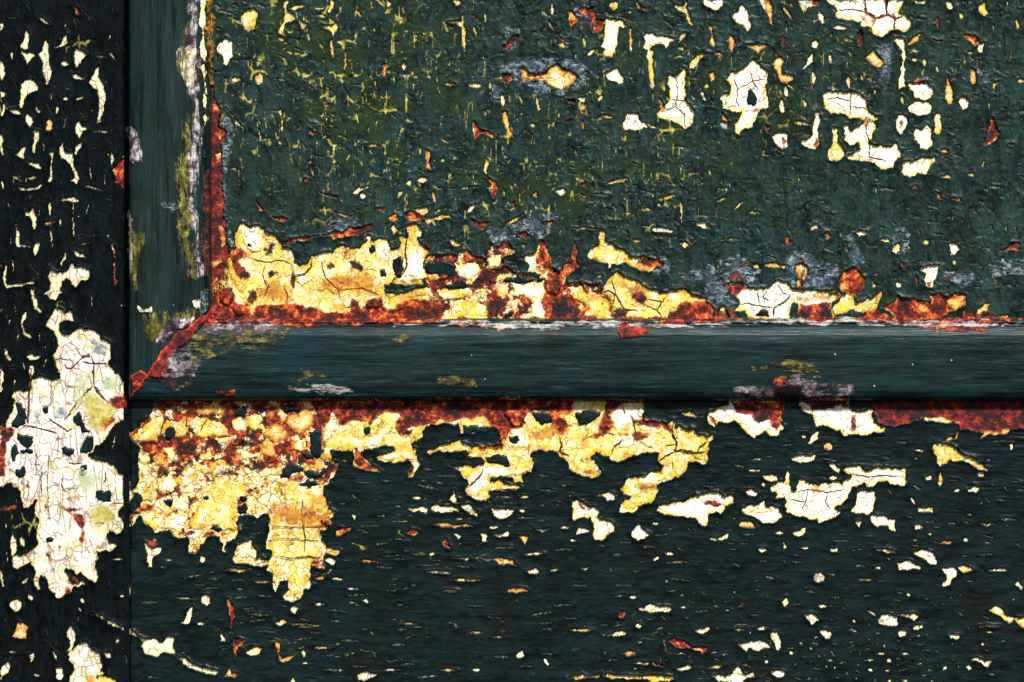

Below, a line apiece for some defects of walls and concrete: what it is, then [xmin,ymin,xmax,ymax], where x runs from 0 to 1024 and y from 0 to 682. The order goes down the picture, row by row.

peeling [587,2,819,135]
crack [734,73,766,108]
peeling [760,0,969,177]
rust [95,0,511,431]
peeling [213,149,882,319]
rust [494,232,780,338]
crack [20,349,108,519]
crack [160,417,207,436]
rust [312,390,575,452]
peeling [0,250,907,638]
rust [731,401,785,429]
crack [272,499,329,559]